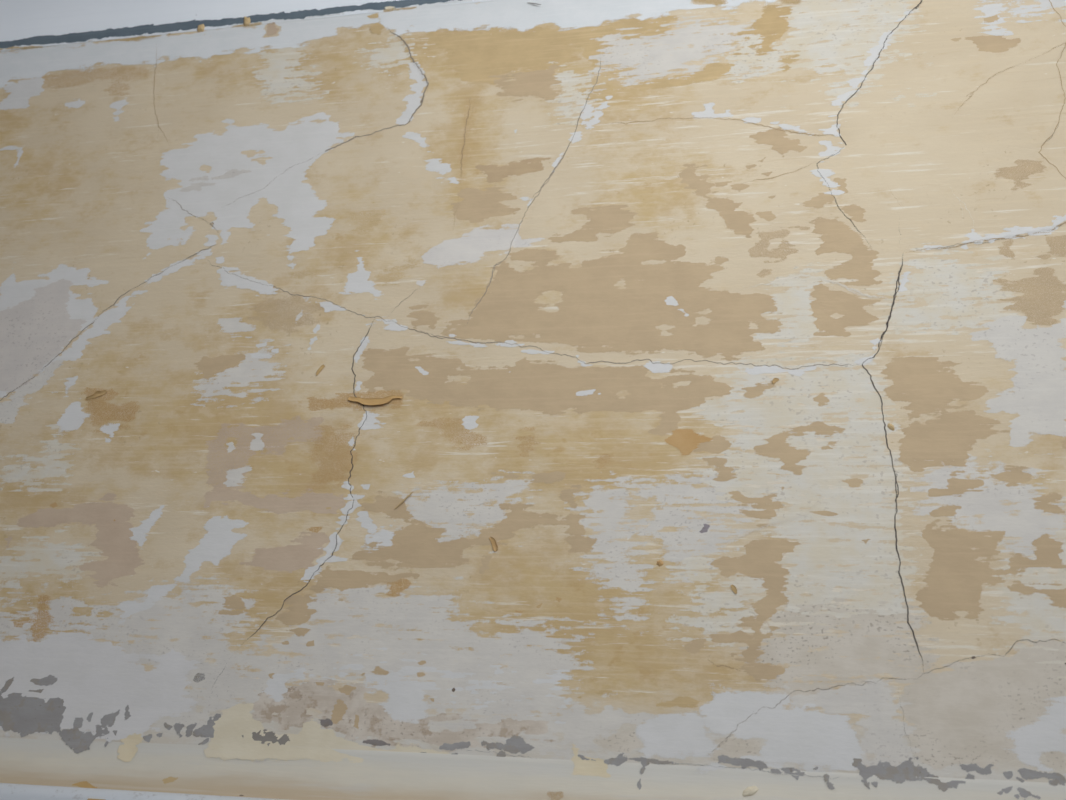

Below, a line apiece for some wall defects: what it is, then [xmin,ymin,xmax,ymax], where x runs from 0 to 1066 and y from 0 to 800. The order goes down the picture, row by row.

peeling [0,0,461,50]
flaking render [139,112,355,269]
crack [228,29,429,205]
peeling [348,132,783,436]
crack [467,0,922,324]
peeling [678,163,883,337]
crack [955,0,1066,178]
flaking render [0,623,221,754]
peeling [117,471,597,647]
crack [0,200,1066,752]
flaking render [565,433,1066,800]
flaking render [881,235,1066,621]